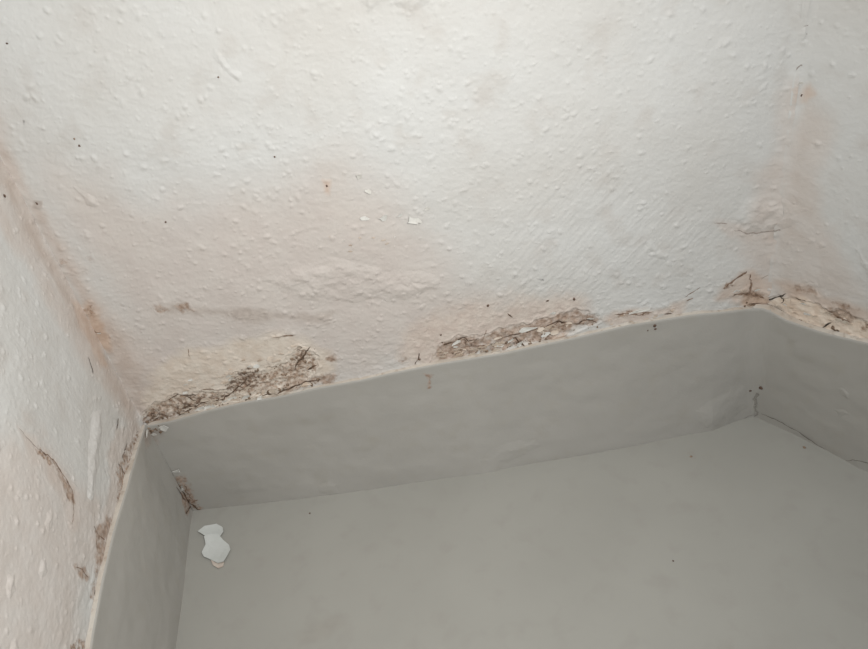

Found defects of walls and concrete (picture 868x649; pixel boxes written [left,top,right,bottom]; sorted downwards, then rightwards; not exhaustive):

peeling [139,327,346,425]
water stain [0,60,544,649]
peeling [392,277,608,369]
peeling [768,277,868,338]